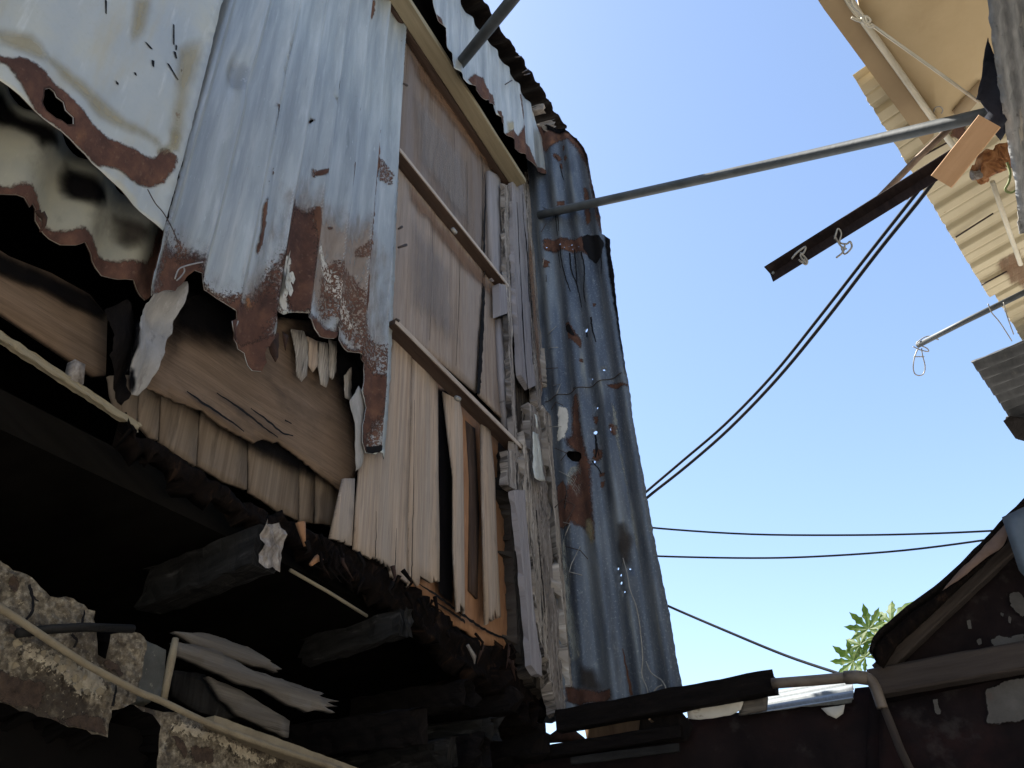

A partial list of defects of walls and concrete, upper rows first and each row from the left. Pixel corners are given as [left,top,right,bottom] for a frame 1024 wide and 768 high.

corrosion [0,55,179,187]
corrosion [468,73,604,308]
corrosion [0,132,395,454]
corrosion [557,387,617,540]
peeling [985,678,1024,724]